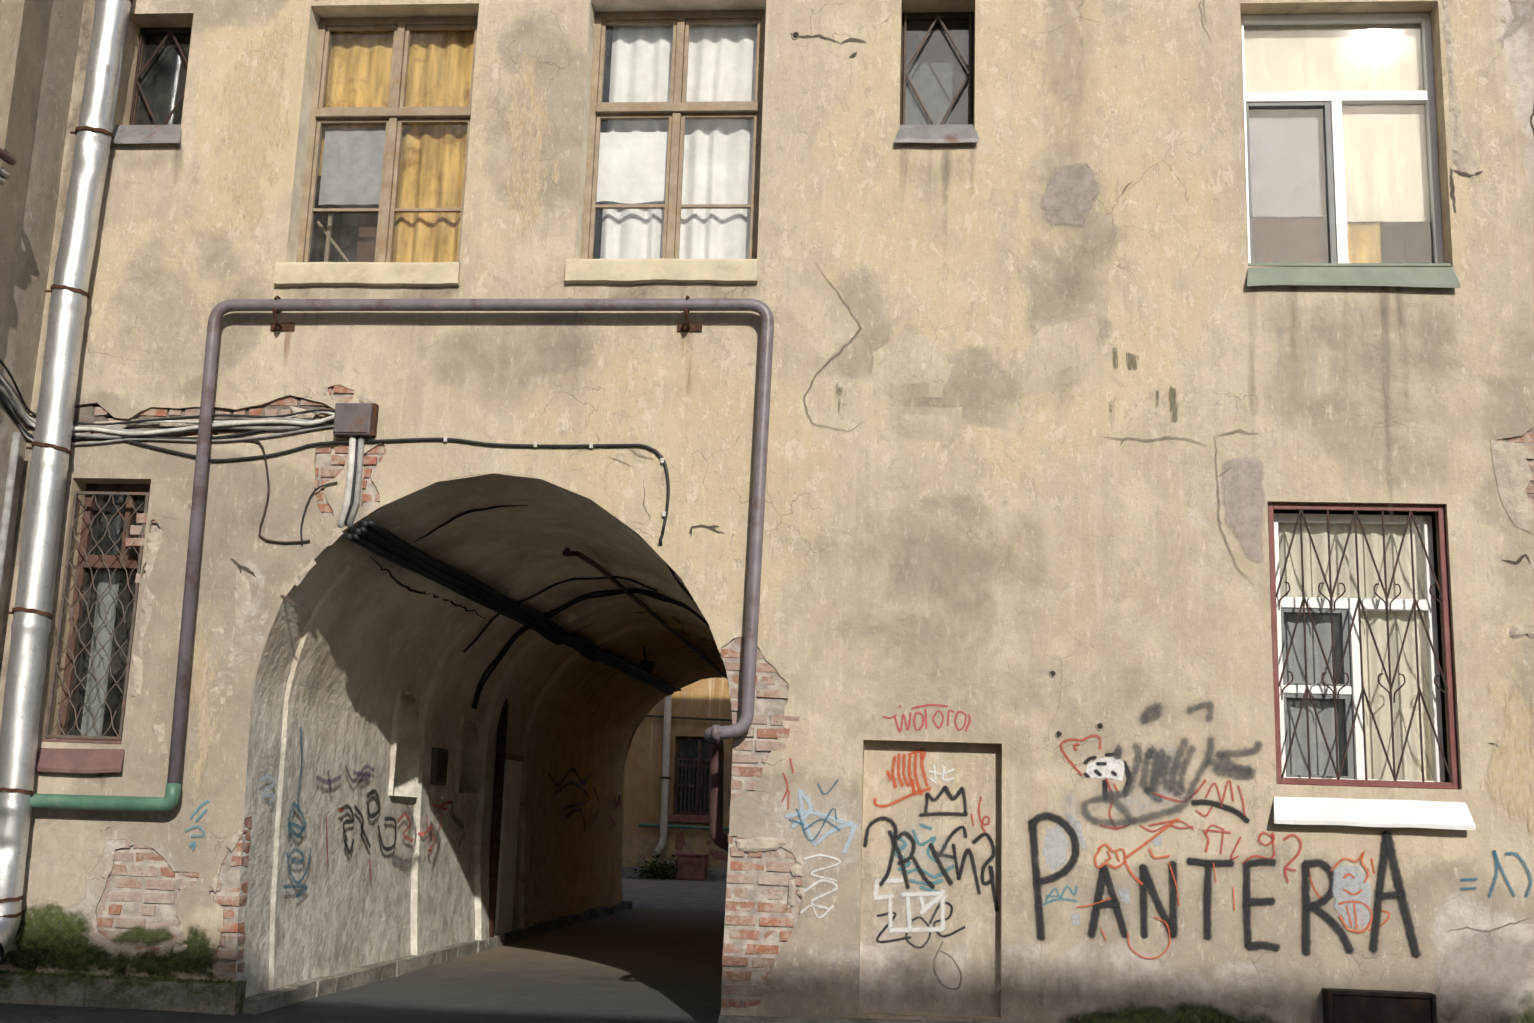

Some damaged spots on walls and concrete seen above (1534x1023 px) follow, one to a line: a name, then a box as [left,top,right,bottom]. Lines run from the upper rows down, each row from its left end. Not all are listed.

crack [790,33,866,57]
spalling [71,385,376,443]
spalling [293,444,396,586]
crack [803,264,864,432]
spalling [1491,427,1534,535]
peeling [126,513,162,697]
peeling [152,722,168,754]
spalling [720,637,800,801]
peeling [147,812,166,822]
spalling [88,816,252,981]
spalling [706,819,822,1015]